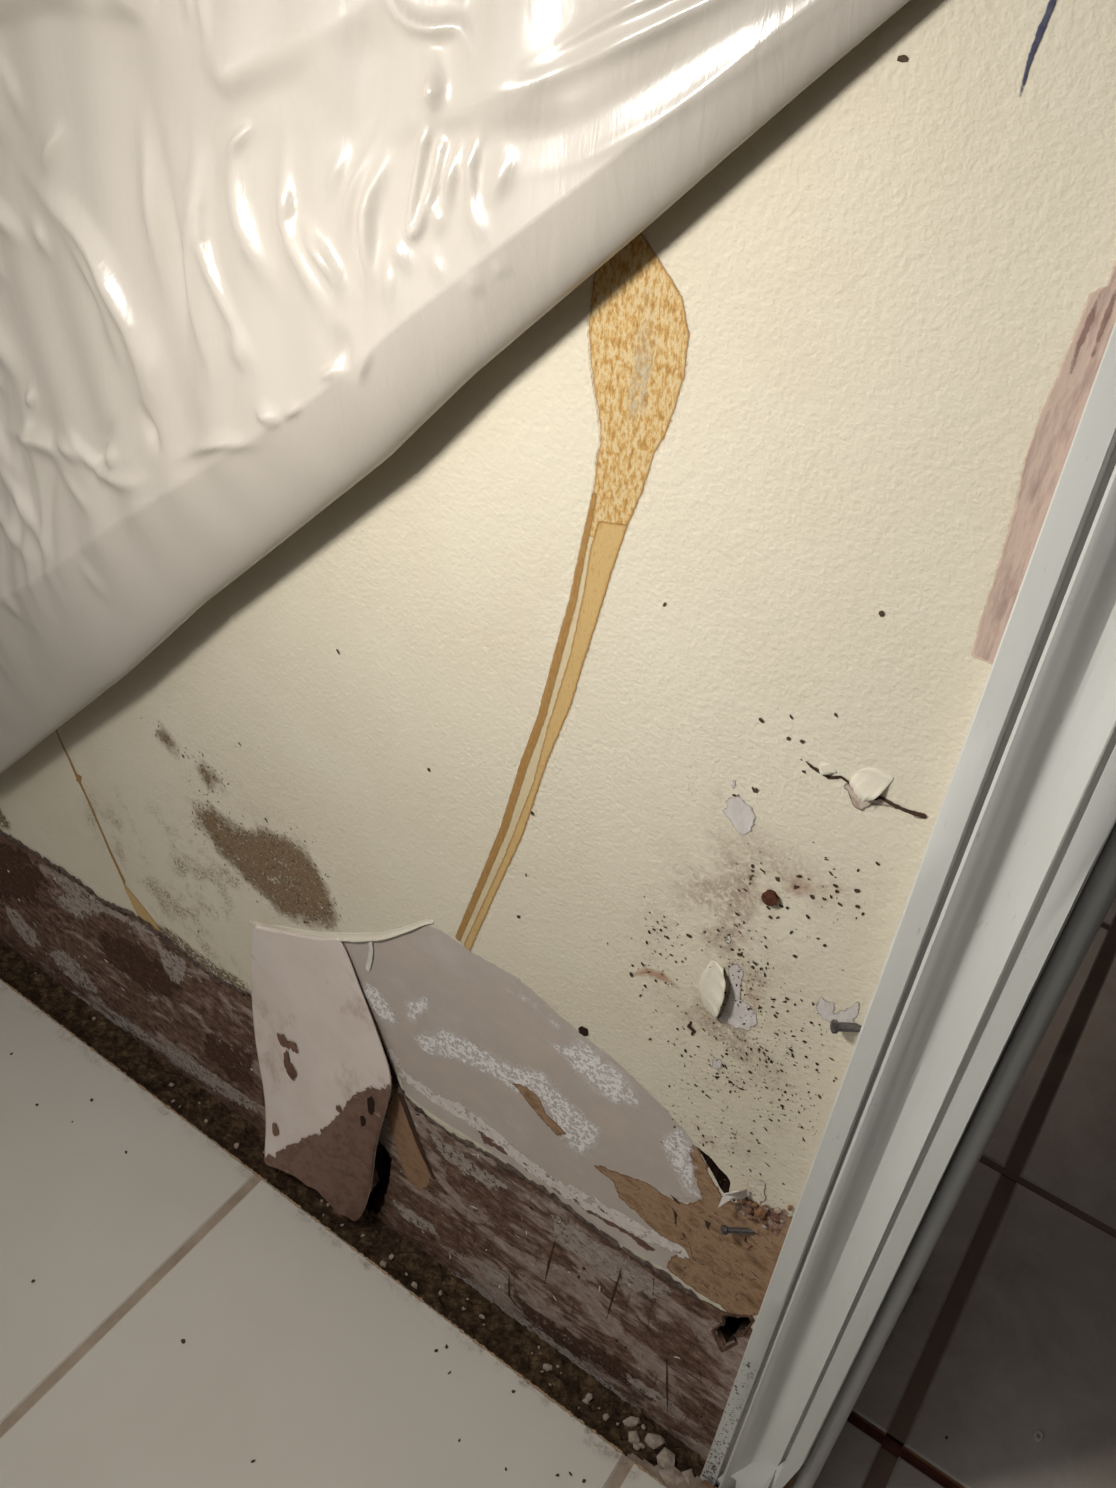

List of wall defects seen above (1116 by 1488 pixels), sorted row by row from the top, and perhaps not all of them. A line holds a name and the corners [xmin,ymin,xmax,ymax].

peeling [972,262,1116,664]
mould [141,718,350,930]
peeling [819,763,894,802]
crack [806,761,927,819]
peeling [0,835,266,1134]
mould [629,844,864,1183]
peeling [249,919,793,1460]